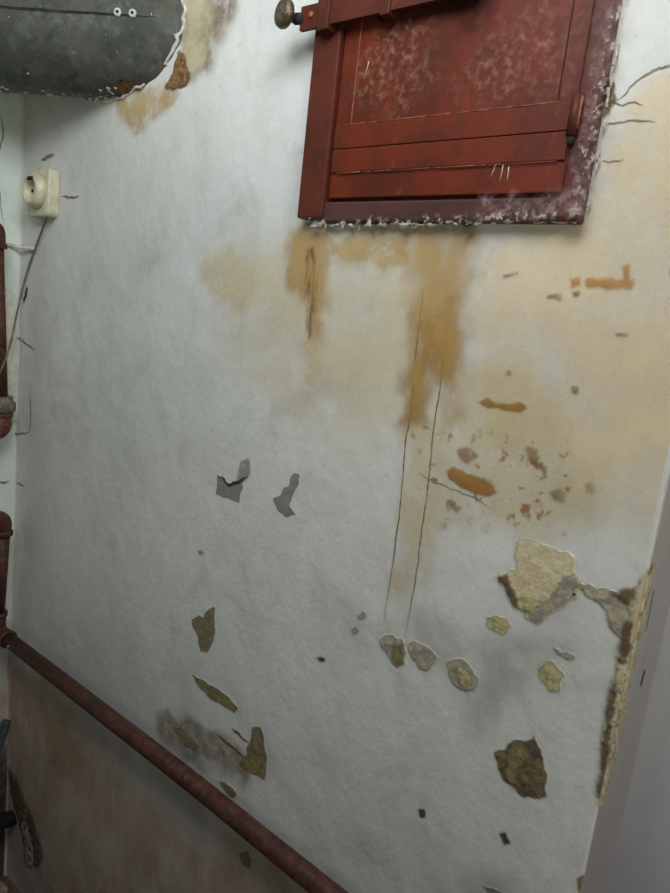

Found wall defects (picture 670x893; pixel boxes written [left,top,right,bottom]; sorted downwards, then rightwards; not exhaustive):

leakage [163,0,187,66]
crack [608,64,670,124]
leakage [288,234,406,337]
leakage [407,231,471,418]
peeling [482,226,670,479]
peeling [216,459,250,503]
peeling [273,472,301,517]
flaking render [192,606,216,652]
flaking render [379,633,479,693]
flaking render [494,537,655,807]
leakage [0,672,177,893]
flaking render [217,725,268,780]